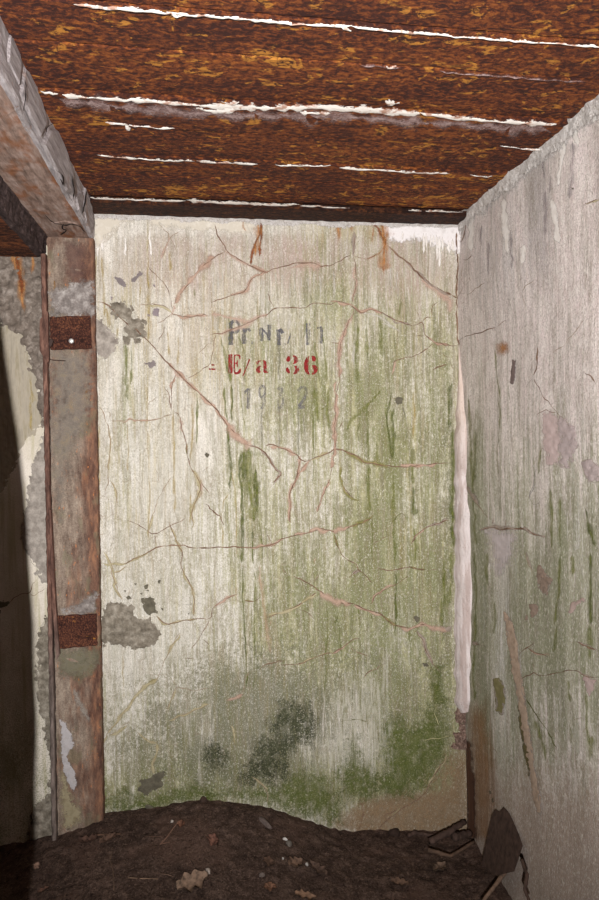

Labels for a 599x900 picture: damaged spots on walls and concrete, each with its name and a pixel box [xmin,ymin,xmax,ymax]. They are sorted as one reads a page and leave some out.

water stain [41,91,556,134]
rust [250,223,263,264]
rust [369,225,388,269]
water stain [383,216,489,267]
peeling [96,297,159,359]
crack [527,321,583,416]
peeling [0,256,47,583]
crack [100,225,504,773]
crack [467,486,545,571]
peeling [101,580,163,650]
water stain [238,701,316,786]
water stain [322,675,492,838]